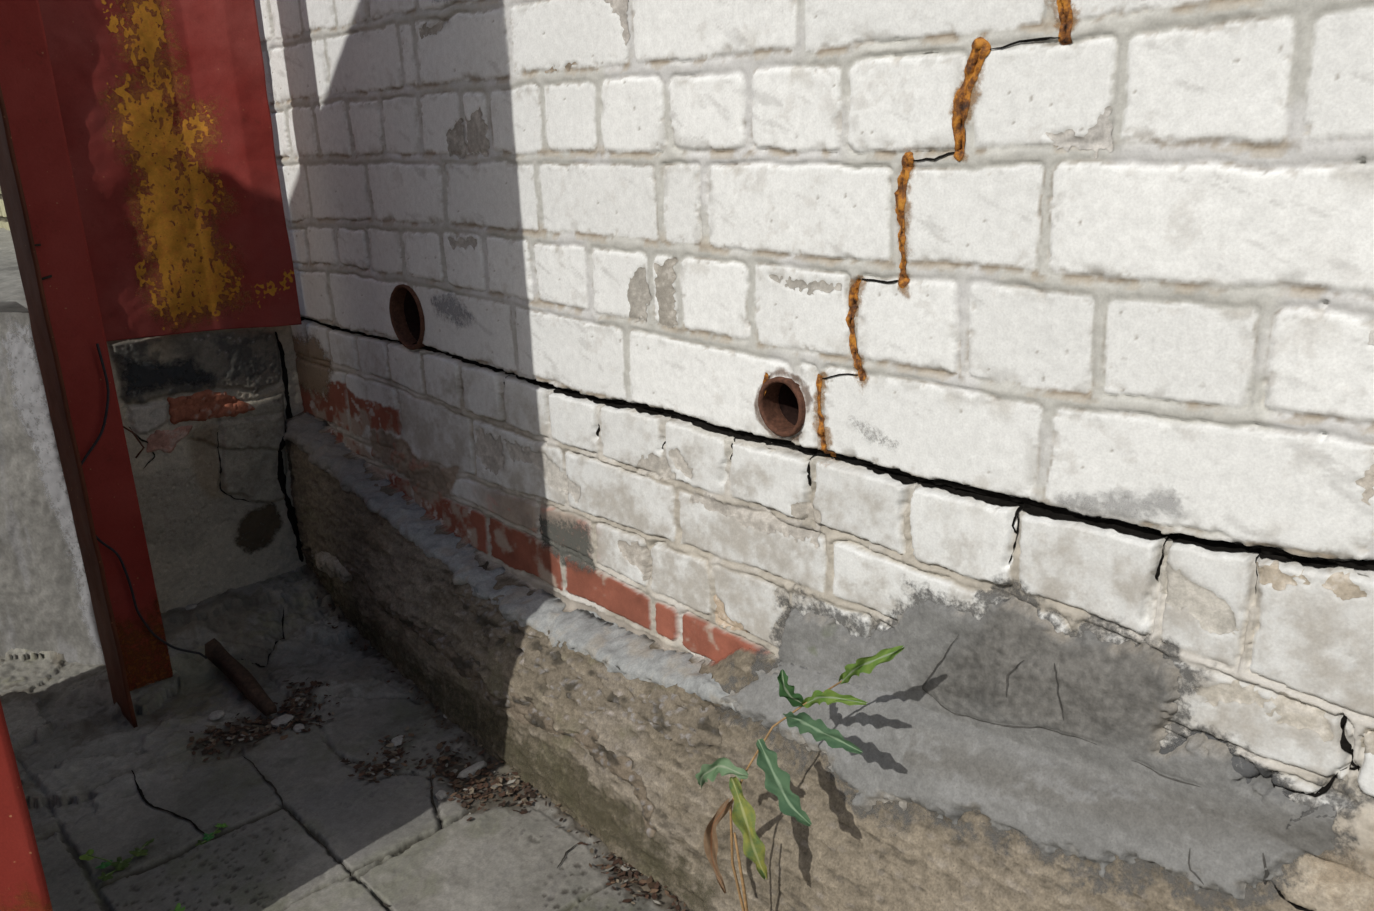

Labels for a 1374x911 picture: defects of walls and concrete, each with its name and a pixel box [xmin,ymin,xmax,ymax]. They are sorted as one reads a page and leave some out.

crack [217,0,1374,593]
crack [129,427,155,469]
spalling [475,427,581,503]
spalling [637,448,822,549]
damp [235,504,282,554]
crack [241,608,285,667]
spalling [713,594,750,633]